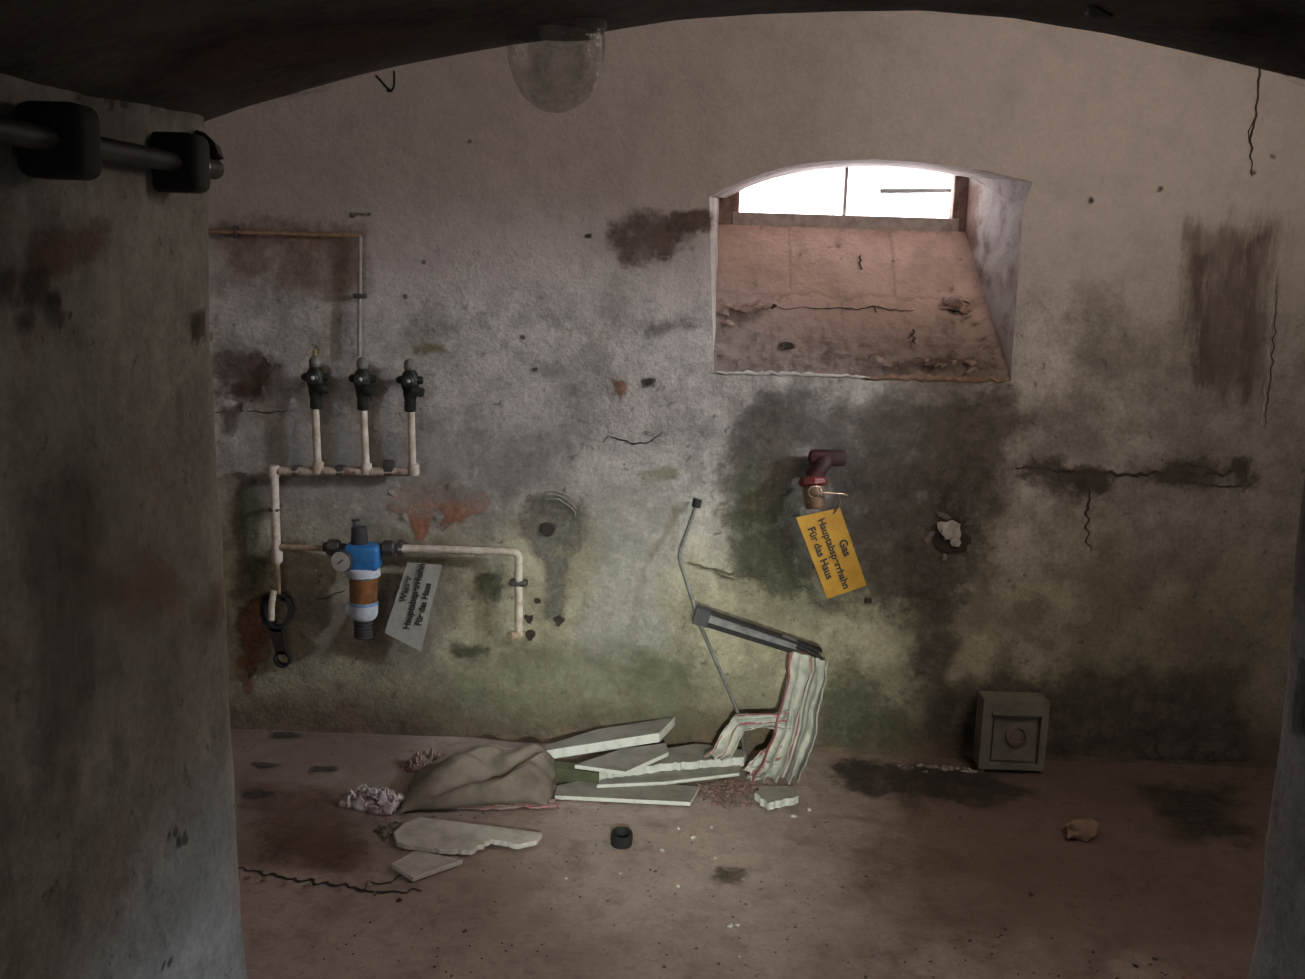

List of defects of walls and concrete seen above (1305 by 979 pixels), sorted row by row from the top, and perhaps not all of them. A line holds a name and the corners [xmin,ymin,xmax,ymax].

crack [1248,69,1261,177]
spalling [923,512,974,562]
damp [720,383,1259,762]
crack [1054,463,1244,550]
damp [1292,658,1305,736]
damp [833,759,1029,807]
crack [238,867,422,896]